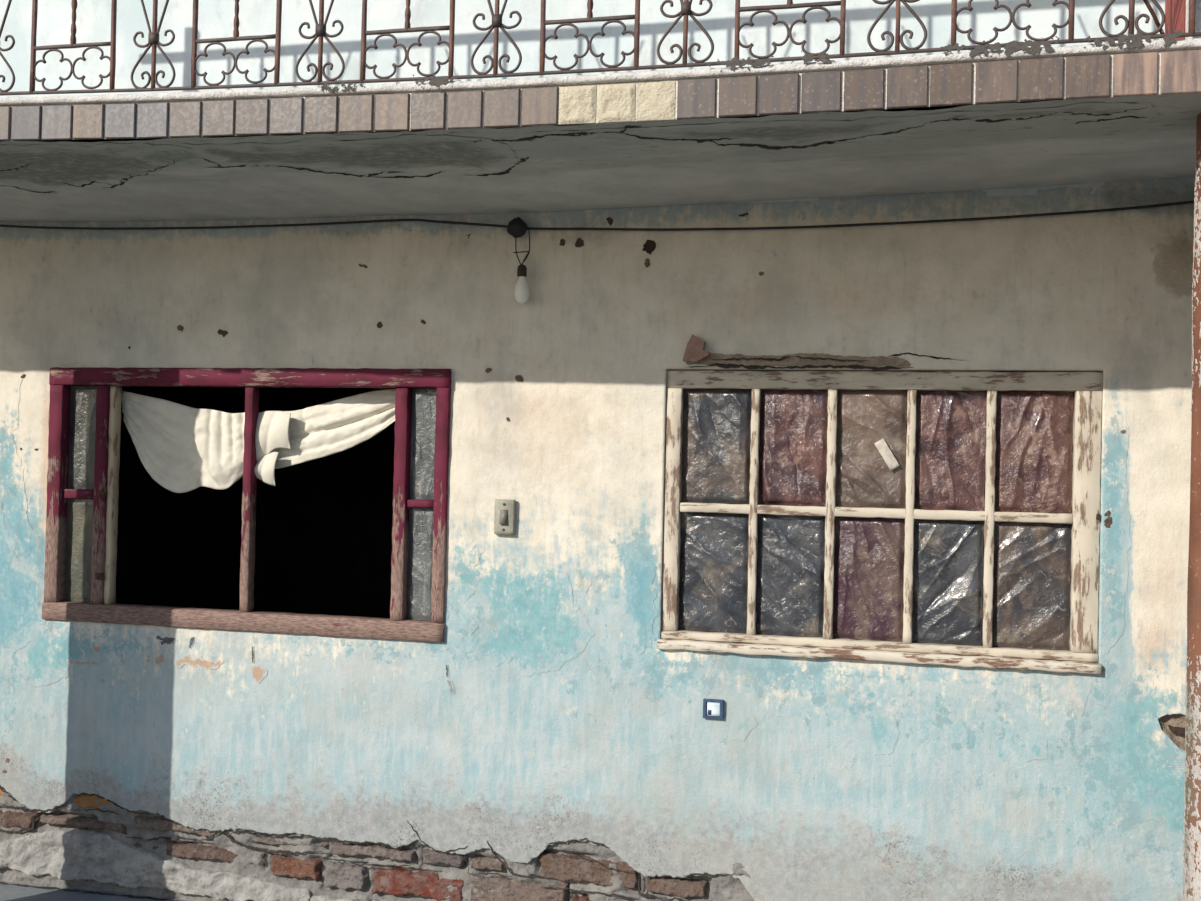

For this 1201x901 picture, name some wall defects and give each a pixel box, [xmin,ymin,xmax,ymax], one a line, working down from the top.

crack [0,107,1153,193]
peeling [1191,147,1201,411]
peeling [1102,400,1132,654]
peeling [449,538,594,677]
peeling [615,549,661,655]
peeling [1043,675,1091,716]
spalling [0,770,754,901]
peeling [1106,635,1201,901]